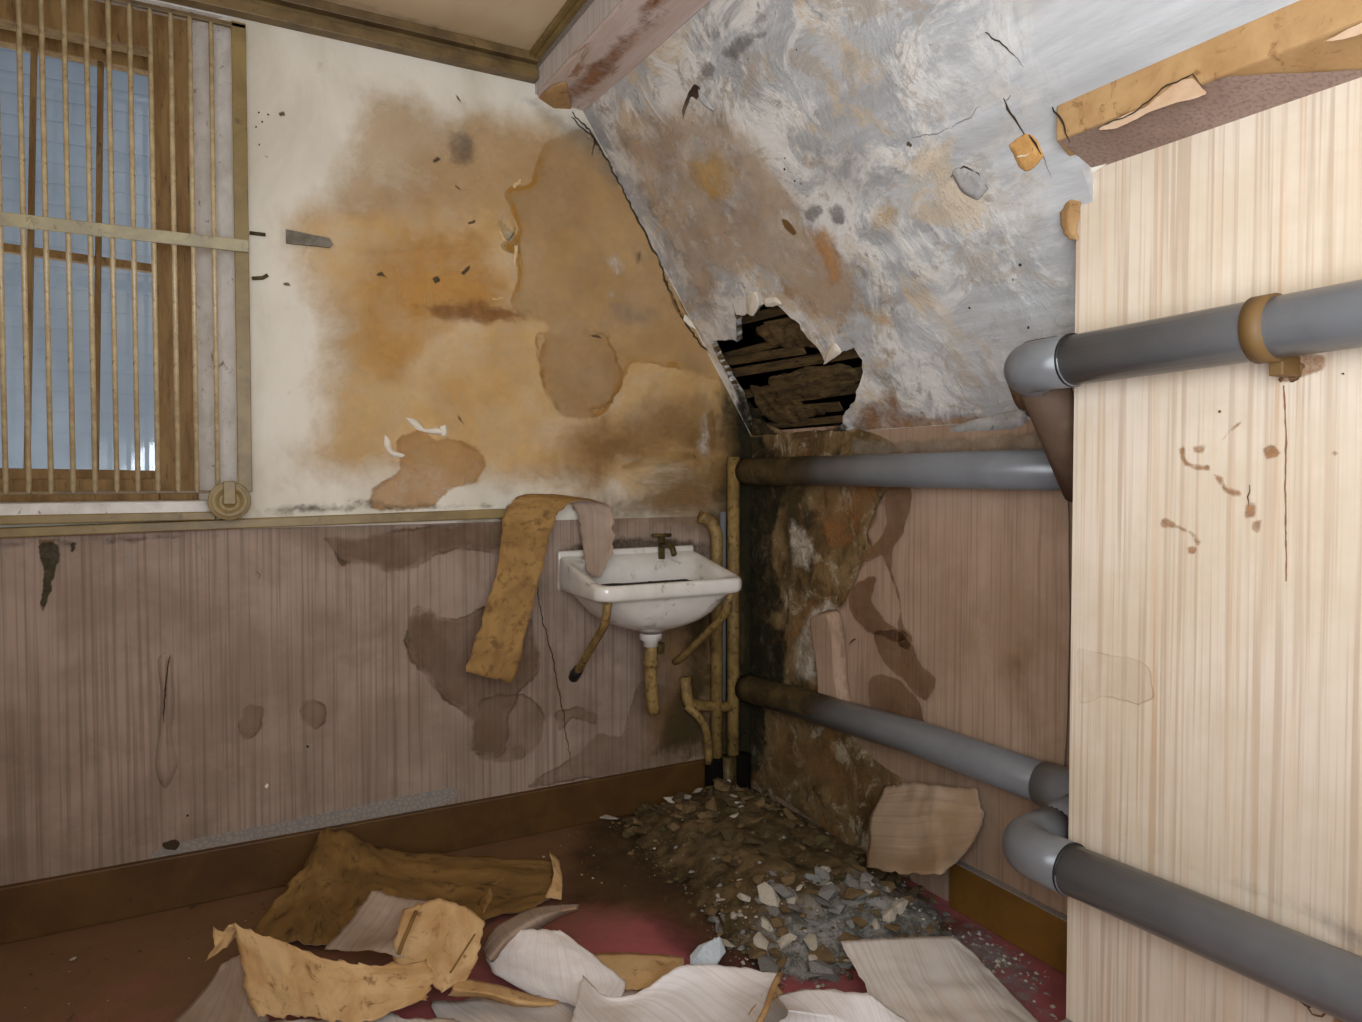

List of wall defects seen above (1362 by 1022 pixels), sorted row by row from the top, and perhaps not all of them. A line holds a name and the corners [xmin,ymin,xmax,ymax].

damp [628,120,851,310]
peeling [371,416,484,510]
damp [302,107,778,798]
spalling [711,292,903,458]
rust [1181,447,1260,527]
rust [1264,446,1279,458]
damp [38,539,76,609]
spalling [749,485,889,692]
damp [849,487,935,721]
spalling [749,704,903,854]